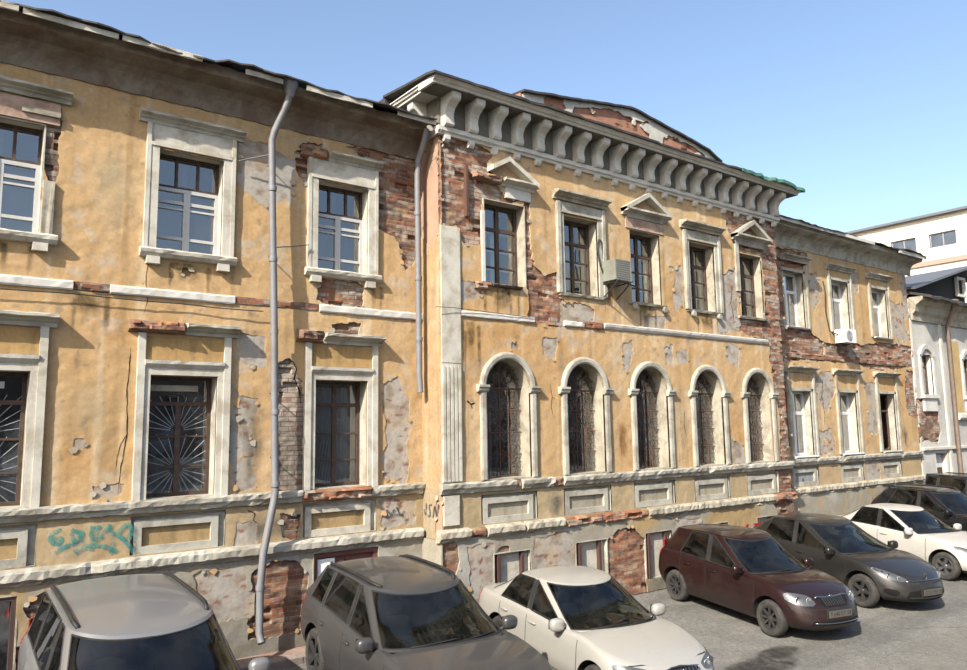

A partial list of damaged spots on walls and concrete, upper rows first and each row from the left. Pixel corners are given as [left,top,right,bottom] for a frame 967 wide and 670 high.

flaking render [347,146,423,270]
flaking render [424,125,594,362]
peeling [236,333,266,370]
flaking render [715,211,941,515]
flaking render [229,358,304,494]
flaking render [193,558,308,640]
flaking render [604,524,647,595]